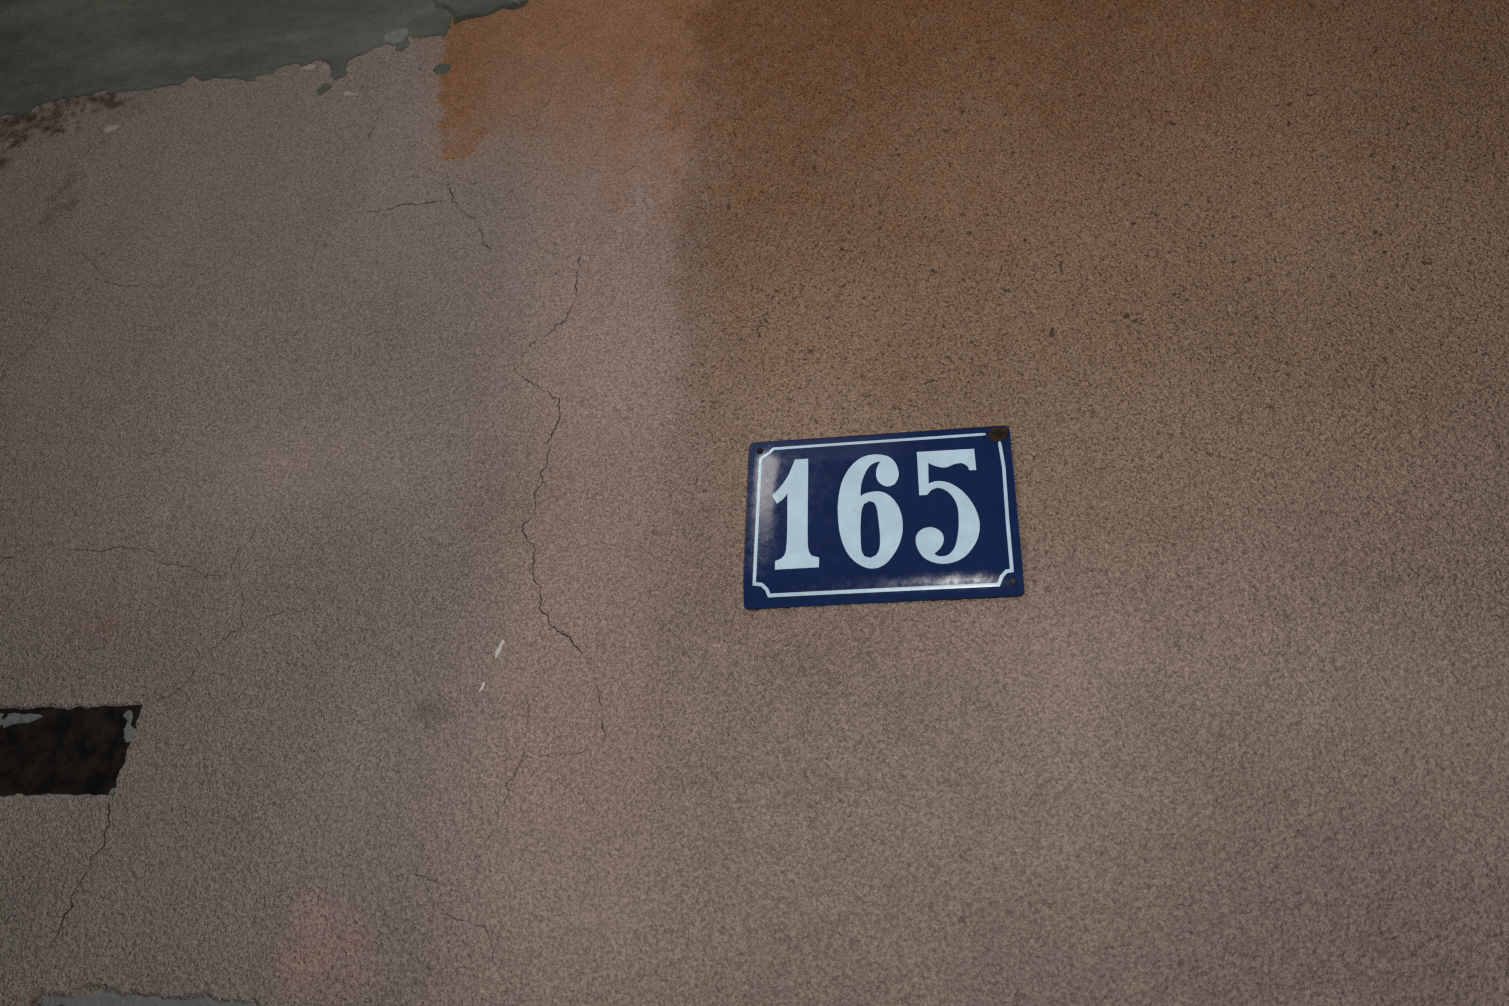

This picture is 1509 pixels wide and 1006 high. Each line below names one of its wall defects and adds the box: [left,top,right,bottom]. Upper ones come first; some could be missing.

crack [367,176,491,251]
crack [481,223,606,848]